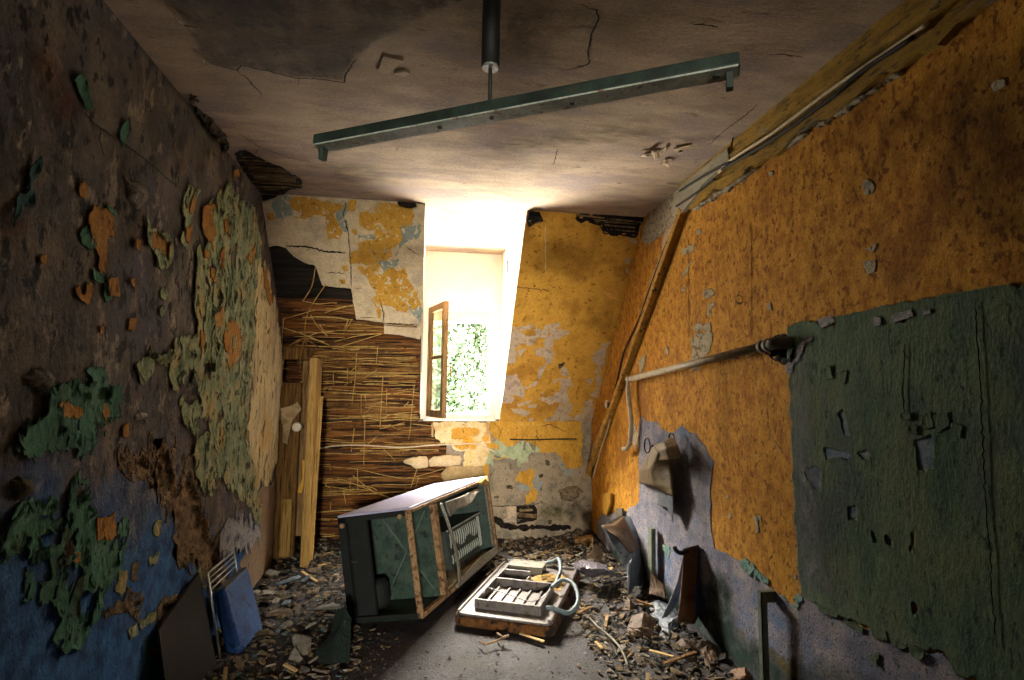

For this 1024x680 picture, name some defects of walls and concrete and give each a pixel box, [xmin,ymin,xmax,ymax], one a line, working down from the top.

crack [210,57,358,95]
crack [556,5,599,70]
crack [288,203,359,289]
flaking render [526,210,543,227]
flaking render [572,190,678,315]
peeling [0,94,302,655]
peeling [502,322,610,422]
peeling [485,439,573,531]
peeling [596,283,1024,680]